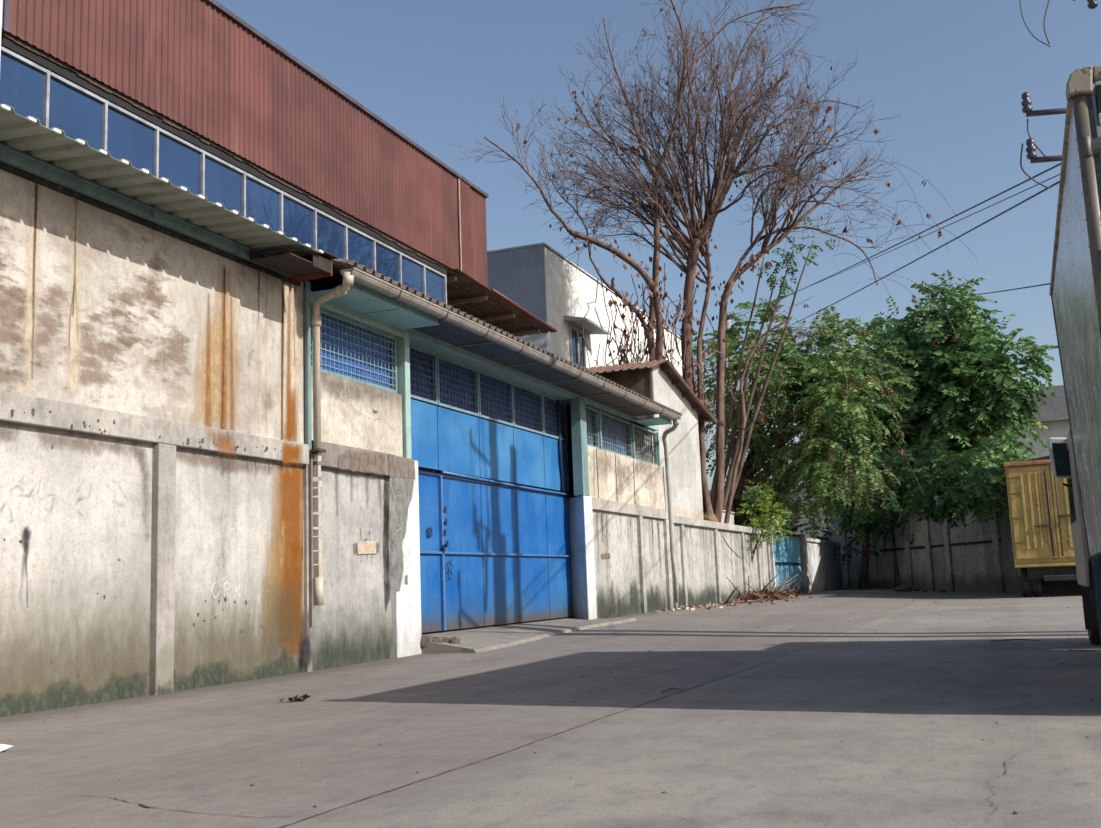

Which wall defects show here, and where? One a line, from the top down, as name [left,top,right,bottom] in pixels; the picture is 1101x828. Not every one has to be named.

rust [197,276,237,470]
rust [267,280,303,655]